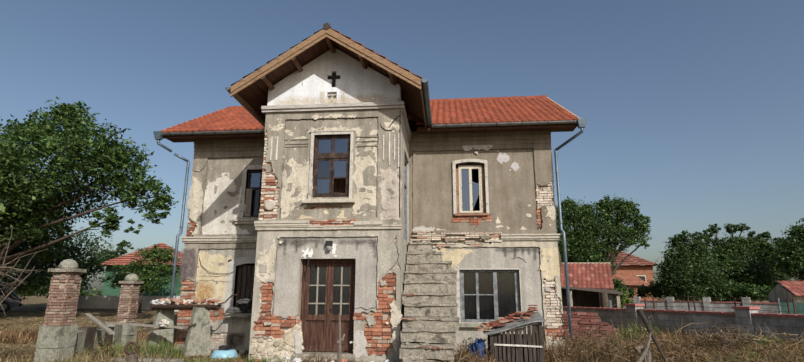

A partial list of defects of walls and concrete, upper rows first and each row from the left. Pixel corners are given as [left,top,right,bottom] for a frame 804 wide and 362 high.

peeling [185,173,250,237]
peeling [259,114,402,226]
flaking render [410,213,510,270]
peeling [462,145,520,171]
flaking render [526,181,557,227]
peeling [174,249,232,346]
flaking render [211,237,304,360]
flaking render [350,273,416,358]
peeling [538,247,564,345]